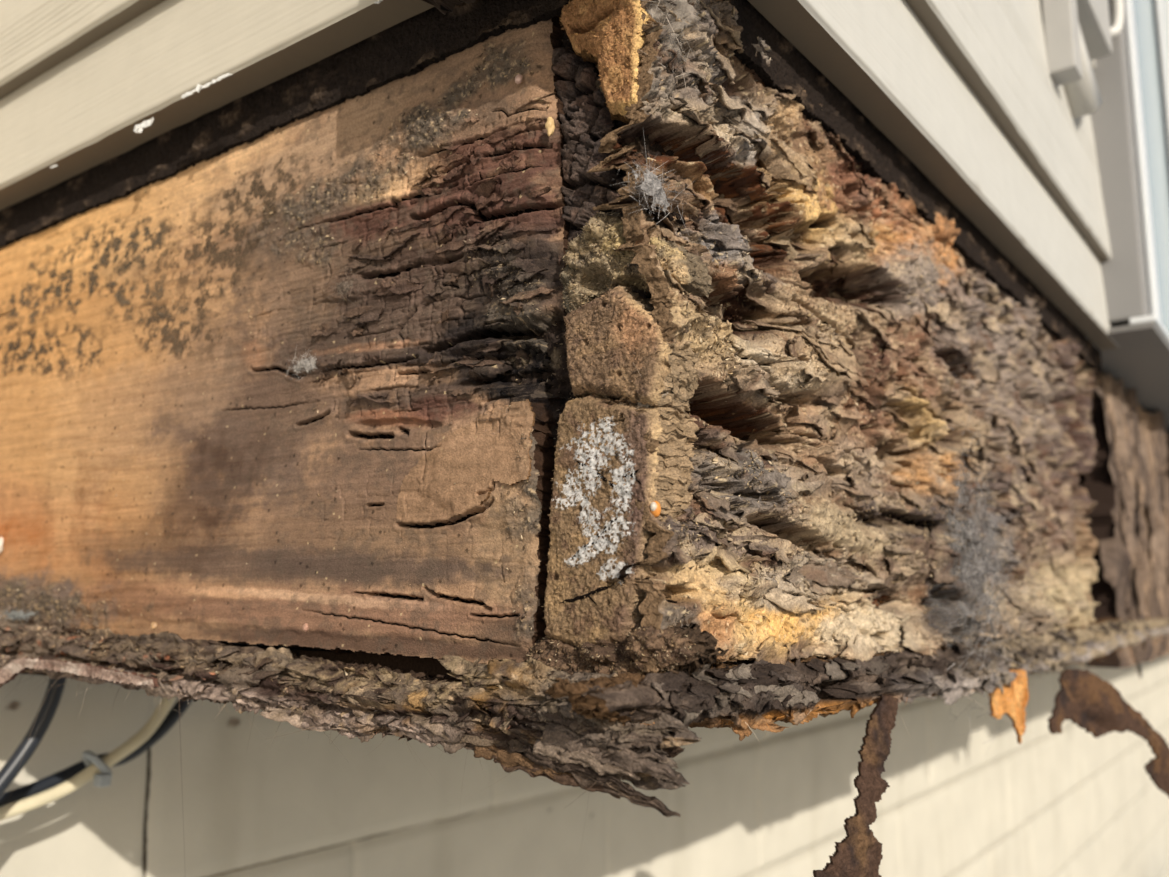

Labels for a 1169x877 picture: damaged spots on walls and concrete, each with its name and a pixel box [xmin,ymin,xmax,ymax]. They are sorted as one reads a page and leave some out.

crack [283,108,565,293]
spalling [612,135,798,261]
mould [0,164,297,376]
crack [225,330,537,426]
crack [357,427,438,455]
hole [688,404,775,437]
hole [936,349,978,380]
crack [404,490,493,529]
crack [314,591,520,646]
peeling [0,657,159,688]
peeling [1047,669,1169,797]
peeling [813,694,899,877]